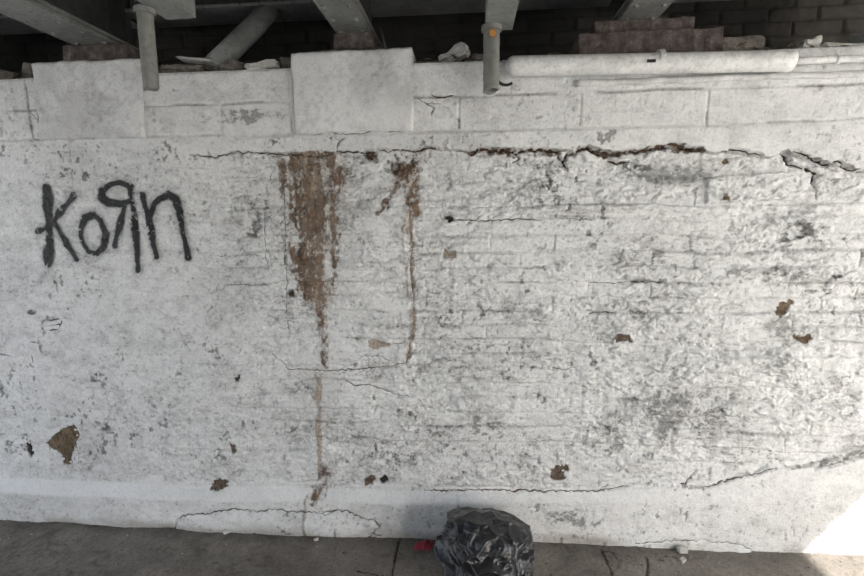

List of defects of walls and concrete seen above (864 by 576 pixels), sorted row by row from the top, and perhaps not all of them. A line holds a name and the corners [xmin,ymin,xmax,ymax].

crack [468,143,706,169]
crack [729,149,857,186]
rust [366,151,423,296]
rust [278,151,345,369]
rust [407,308,416,359]
flaking render [229,145,864,493]
peeling [210,478,229,491]
rust [302,378,328,536]
crack [180,508,399,576]